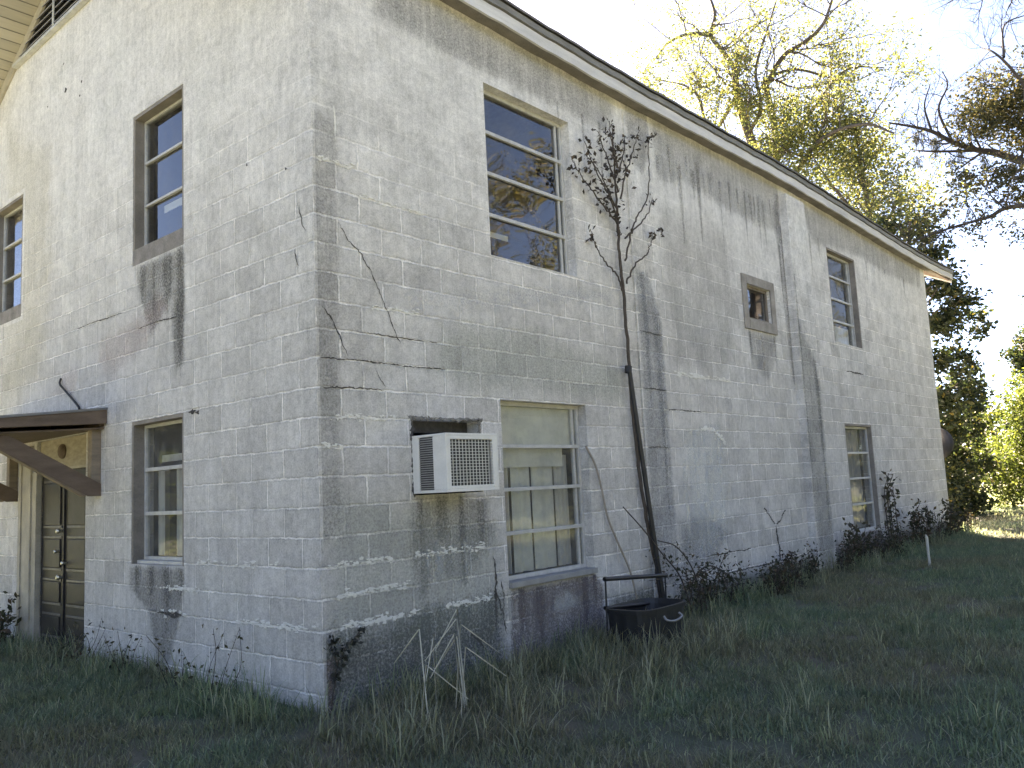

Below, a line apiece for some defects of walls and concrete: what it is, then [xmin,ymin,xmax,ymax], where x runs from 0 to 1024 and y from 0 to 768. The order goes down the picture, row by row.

crack [321,225,442,391]
peeling [415,541,485,557]
peeling [327,554,394,570]
peeling [336,580,411,601]
peeling [446,593,492,609]
peeling [340,608,420,631]